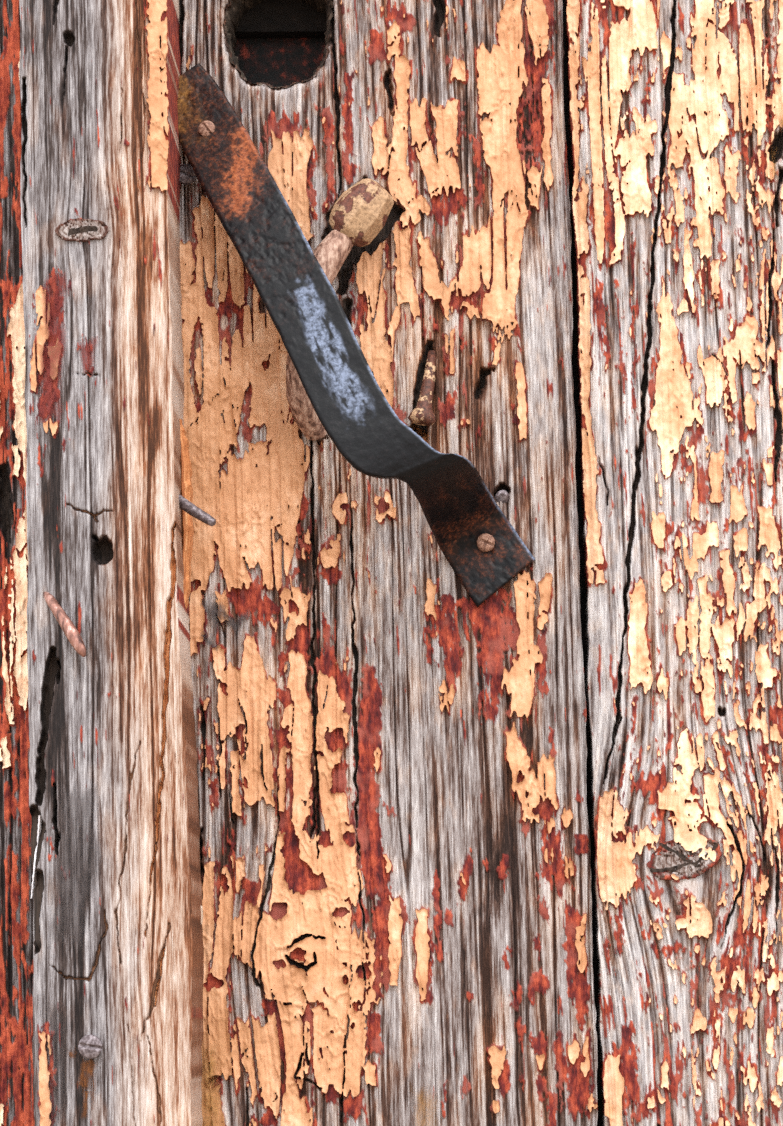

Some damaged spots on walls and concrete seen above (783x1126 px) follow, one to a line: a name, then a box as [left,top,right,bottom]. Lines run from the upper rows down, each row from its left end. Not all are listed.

peeling [0,506,29,769]
peeling [0,283,59,483]
crack [29,522,176,1114]
crack [198,707,280,987]
peeling [180,195,430,1126]
crack [310,440,319,852]
crack [350,526,360,855]
corrosion [413,425,429,442]
peeling [356,0,554,407]
peeling [501,571,573,834]
crack [600,0,676,780]
peeling [566,0,783,1126]